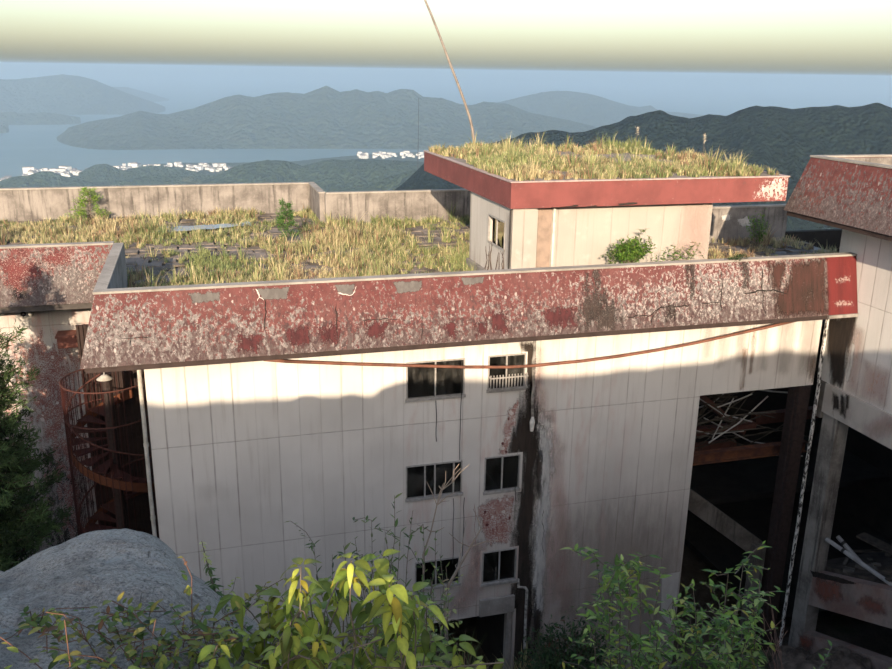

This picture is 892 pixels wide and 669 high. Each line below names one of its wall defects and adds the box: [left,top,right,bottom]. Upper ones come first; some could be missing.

water stain [508,342,555,669]